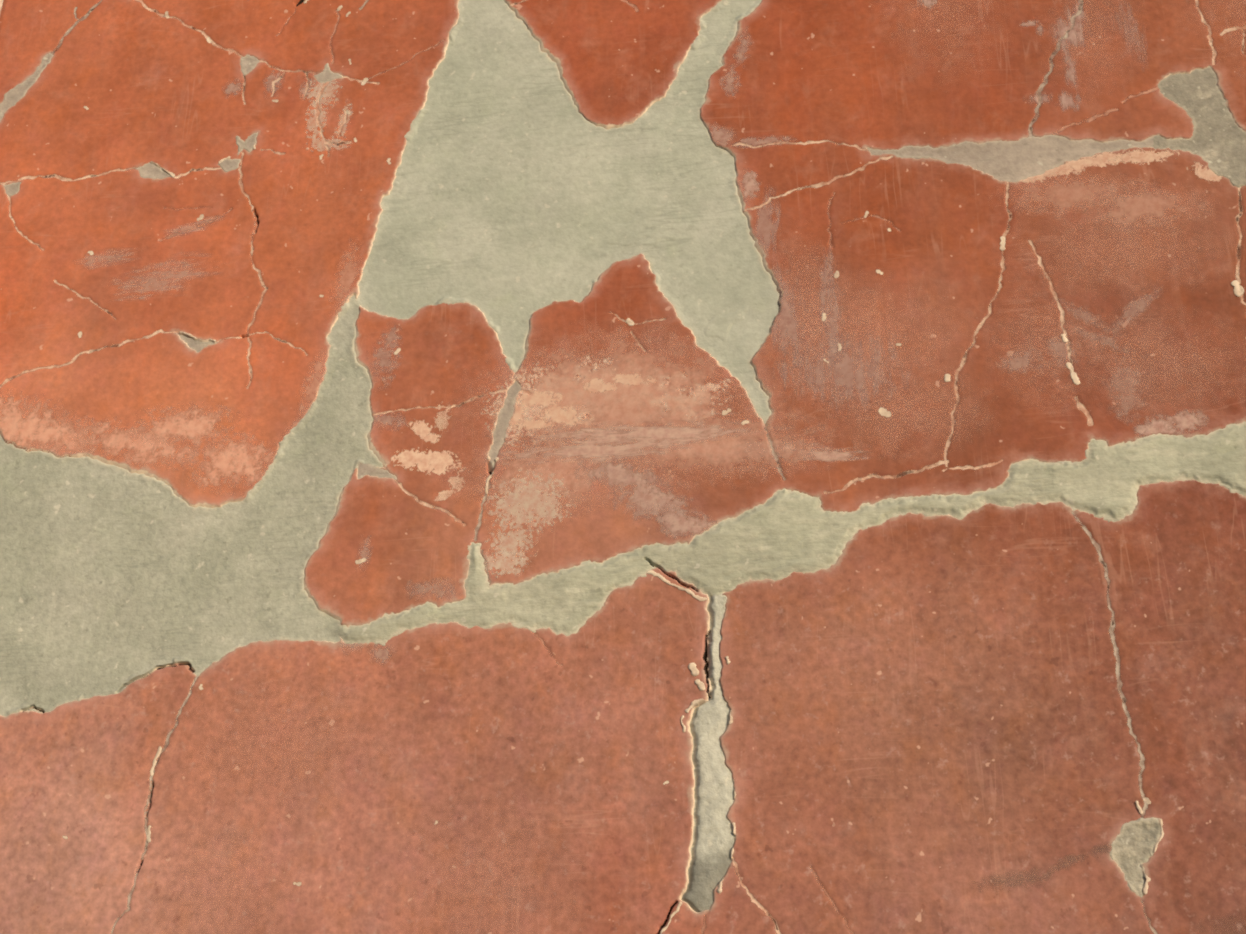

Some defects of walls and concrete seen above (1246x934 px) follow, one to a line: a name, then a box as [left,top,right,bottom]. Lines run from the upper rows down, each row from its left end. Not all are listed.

crack [0,280,179,388]
crack [160,149,308,389]
crack [135,0,444,157]
spalling [0,0,779,717]
crack [732,140,900,238]
crack [823,181,1093,494]
spalling [867,67,1246,188]
crack [1231,187,1246,305]
peeling [681,663,705,732]
crack [1072,513,1148,818]
crack [111,664,198,933]
spalling [1110,797,1164,897]